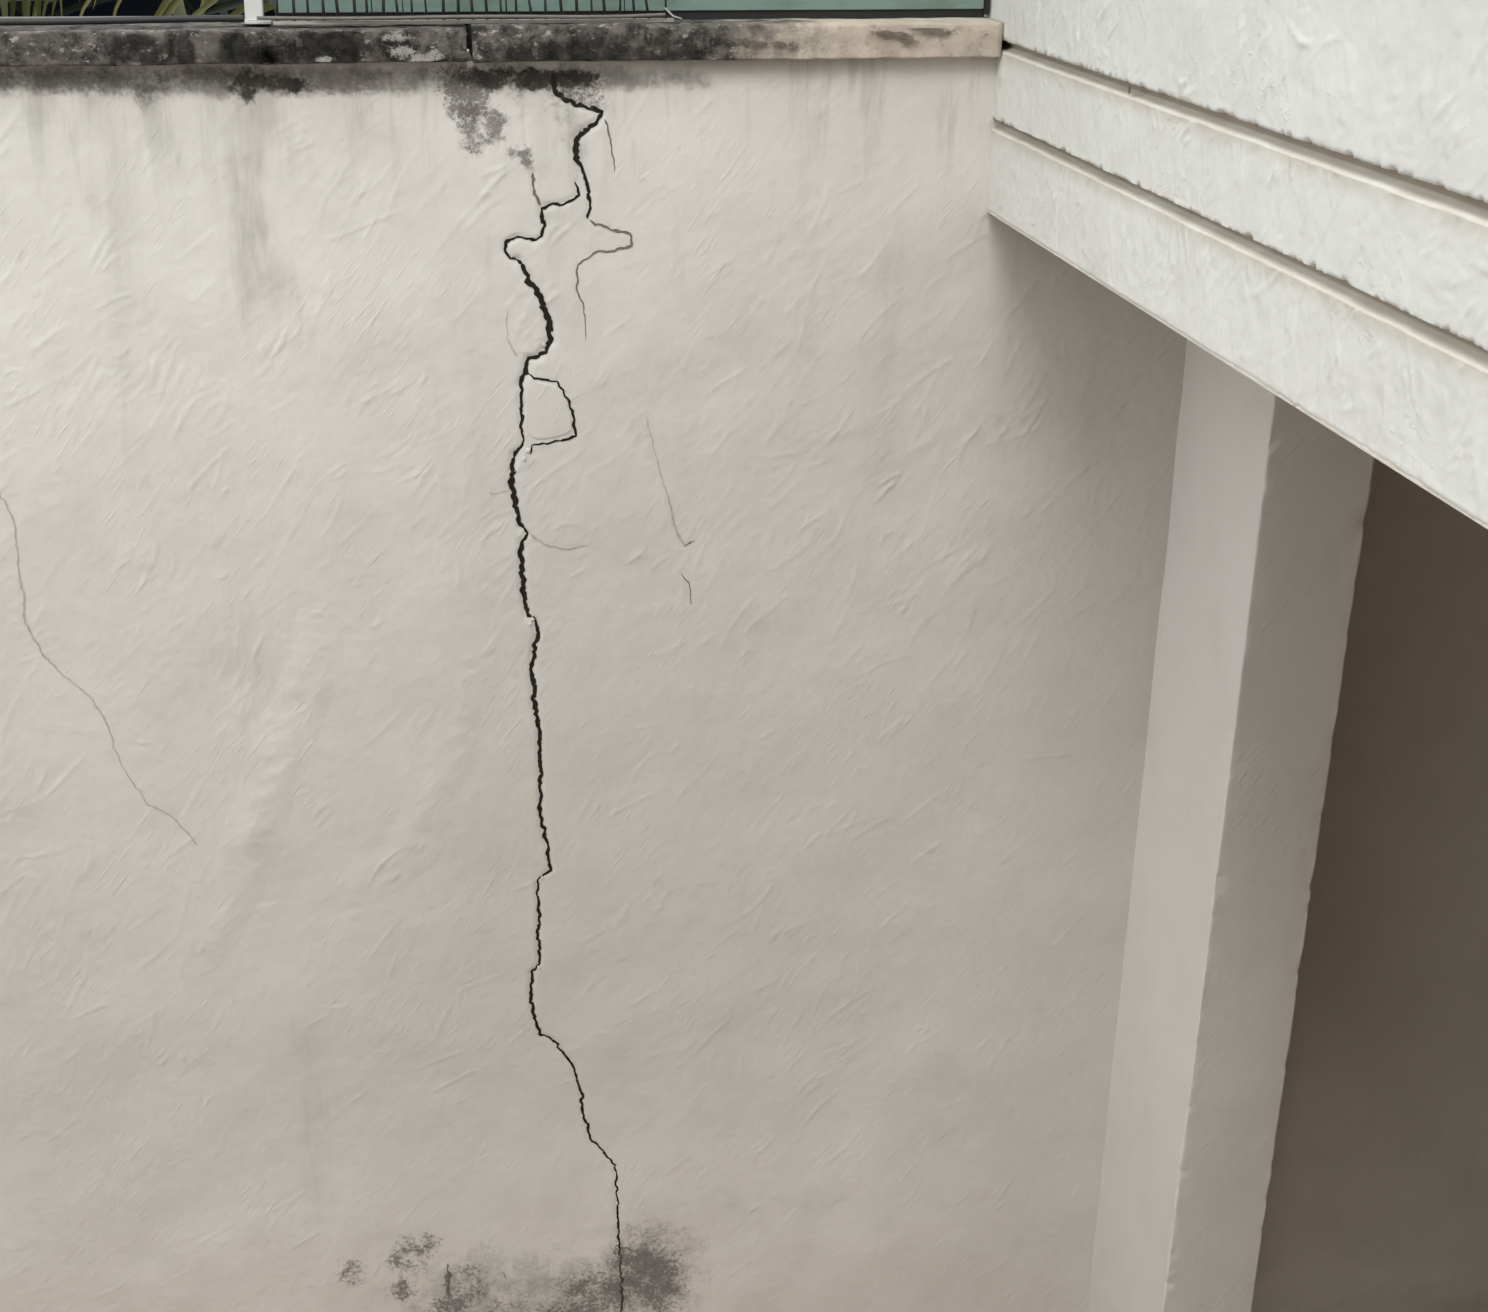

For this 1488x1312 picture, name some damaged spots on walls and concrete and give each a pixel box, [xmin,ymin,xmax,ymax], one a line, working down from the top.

crack [0,496,197,845]
crack [489,75,633,1312]
leakage [389,1236,498,1312]
leakage [548,1244,683,1312]